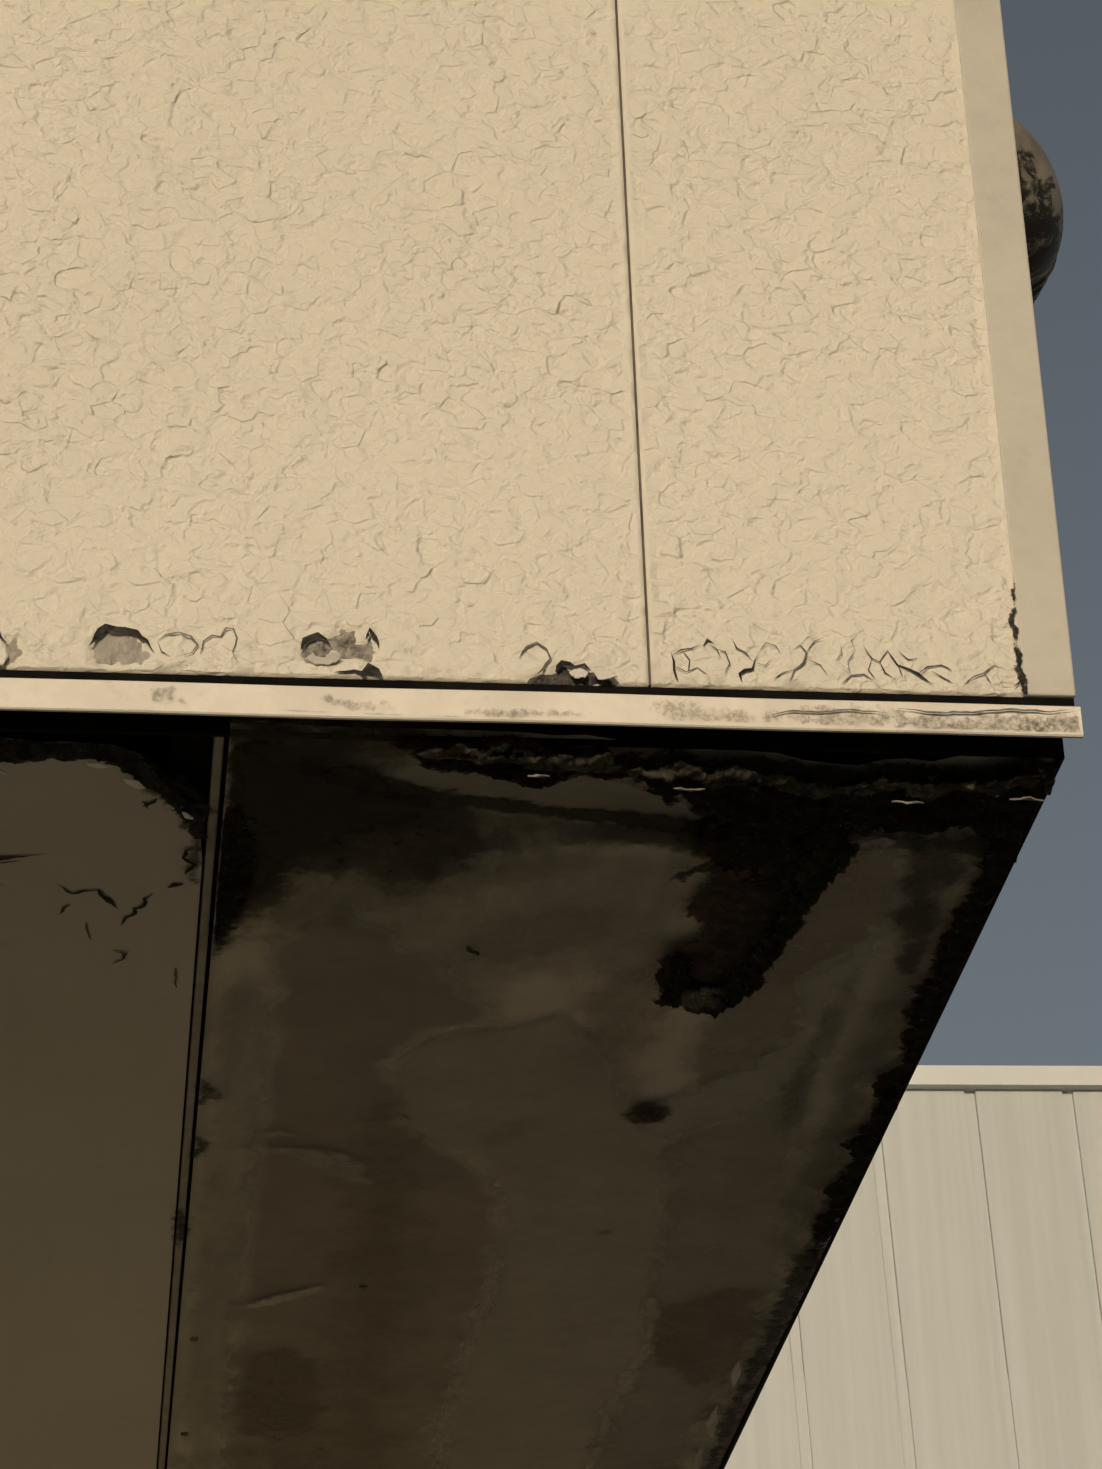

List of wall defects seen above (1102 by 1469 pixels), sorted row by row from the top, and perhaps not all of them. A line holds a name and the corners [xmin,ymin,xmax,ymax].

spalling [0,633,23,666]
spalling [89,624,154,665]
spalling [300,628,382,676]
spalling [519,641,617,686]
crack [671,583,1028,695]
water stain [145,717,726,956]
crack [0,848,196,965]
water stain [592,786,1045,1469]
water stain [218,906,504,1469]